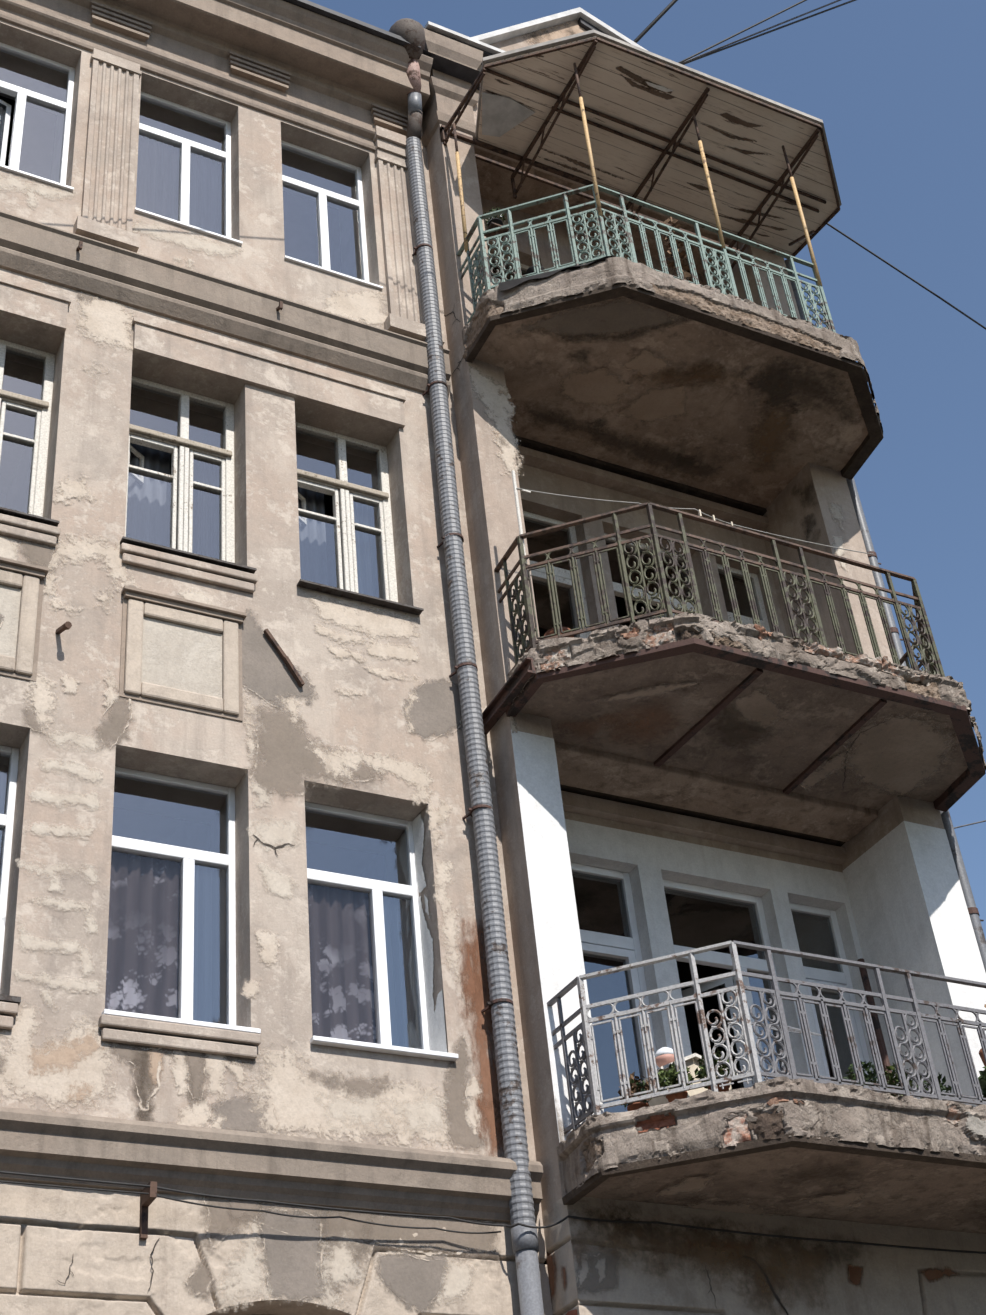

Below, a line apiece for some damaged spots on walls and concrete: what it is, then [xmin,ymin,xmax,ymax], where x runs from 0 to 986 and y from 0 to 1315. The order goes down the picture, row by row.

spalling [519,283,840,357]
peeling [462,302,522,477]
damp [532,411,713,476]
spalling [536,645,574,672]
spalling [615,623,778,653]
peeling [597,683,697,702]
peeling [798,640,952,796]
crack [253,834,294,856]
peeling [209,596,486,1150]
rust [461,923,504,1152]
spalling [635,1112,676,1133]
spalling [722,1097,805,1148]